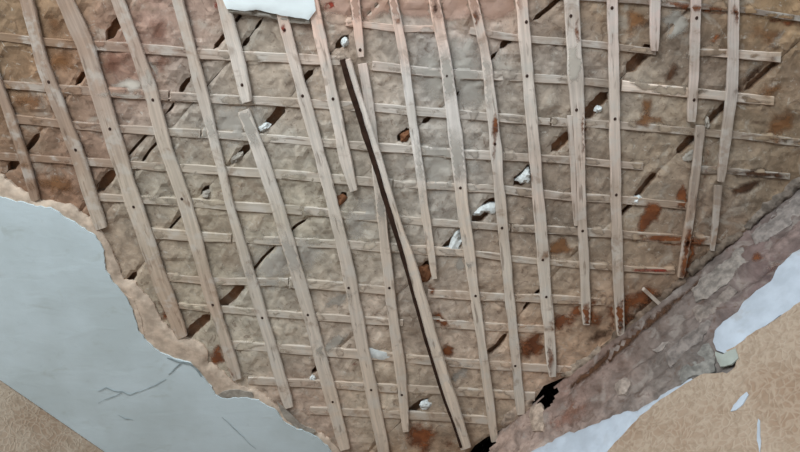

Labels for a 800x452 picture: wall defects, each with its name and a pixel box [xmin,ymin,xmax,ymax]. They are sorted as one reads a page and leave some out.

rust [638,100,660,125]
rust [676,186,687,208]
rust [545,238,571,257]
rust [638,203,704,277]
spalling [0,173,341,452]
spalling [369,348,390,360]
rust [519,334,553,367]
peeling [715,348,739,367]
crack [99,358,202,420]
peeling [731,392,749,412]